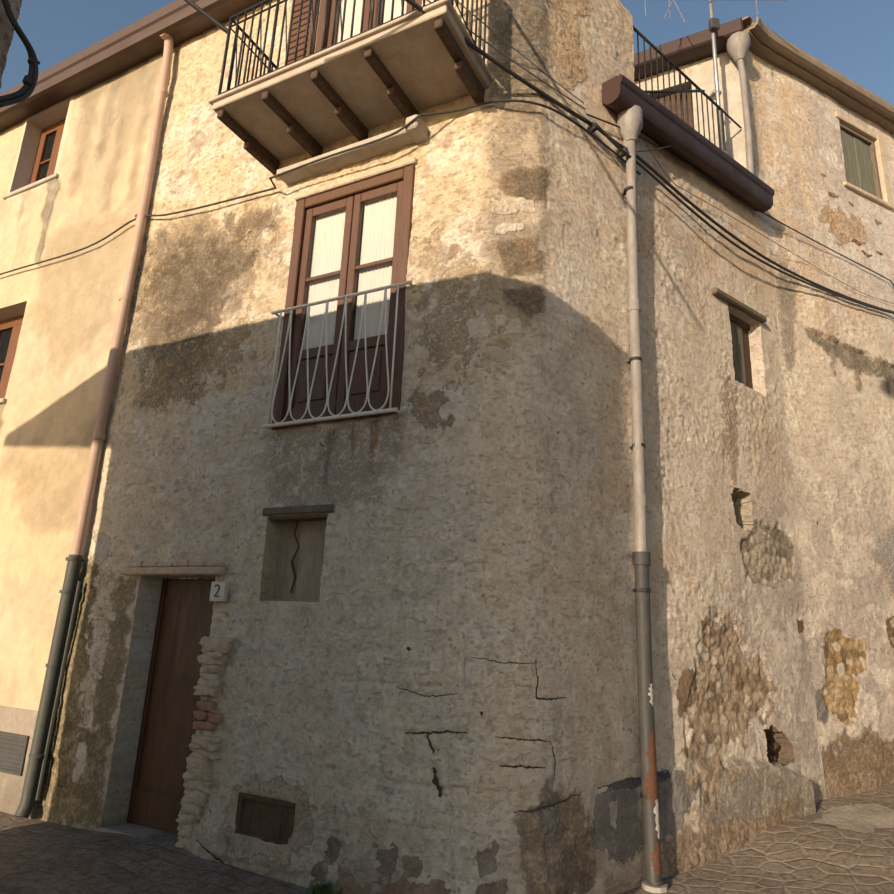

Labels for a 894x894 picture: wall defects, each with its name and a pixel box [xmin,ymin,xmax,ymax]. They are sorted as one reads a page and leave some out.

peeling [818,191,883,258]
water stain [127,206,282,415]
flaking render [740,521,794,588]
peeling [223,773,313,867]
crack [396,686,457,697]
crack [404,730,468,797]
crack [473,657,566,701]
crack [495,736,621,813]
peeling [592,777,644,864]
corrosion [643,730,662,875]
flaking render [657,606,777,843]
flaking render [822,628,867,726]